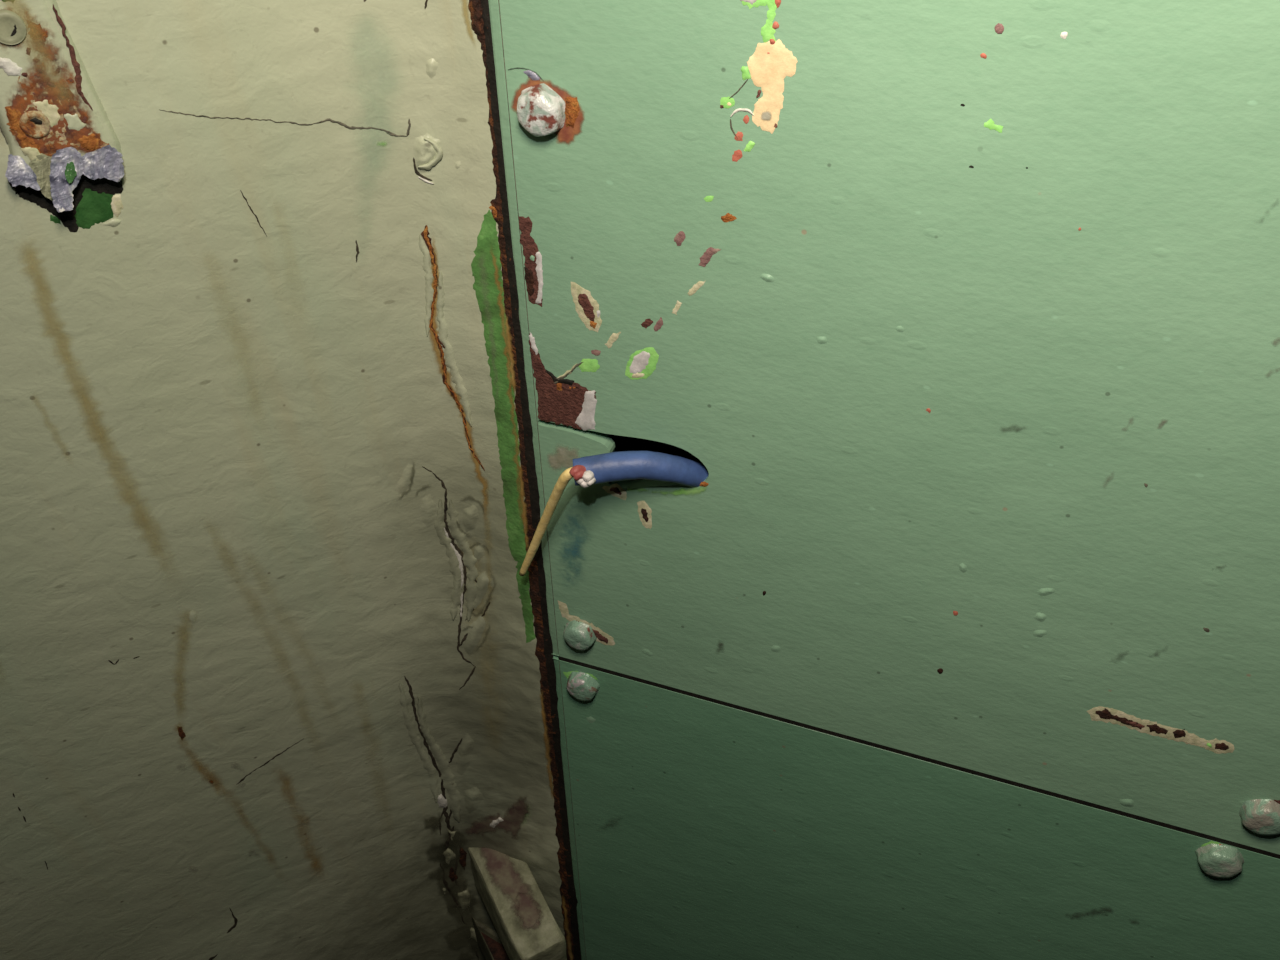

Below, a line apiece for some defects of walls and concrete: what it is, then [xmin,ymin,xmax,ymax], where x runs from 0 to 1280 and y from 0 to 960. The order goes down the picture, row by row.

rust [0,4,109,157]
spalling [8,174,124,232]
crack [161,110,411,145]
crack [411,225,491,690]
peeling [471,210,536,643]
peeling [518,216,543,307]
rust [463,0,615,960]
peeling [625,347,659,380]
peeling [641,247,721,331]
peeling [720,0,798,162]
crack [398,677,462,835]
rust [1087,706,1234,754]